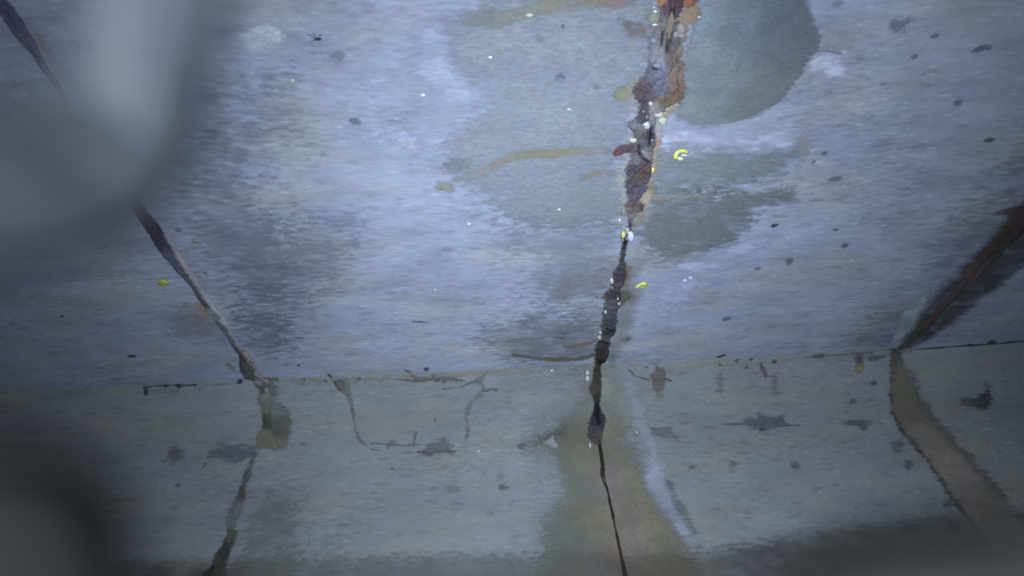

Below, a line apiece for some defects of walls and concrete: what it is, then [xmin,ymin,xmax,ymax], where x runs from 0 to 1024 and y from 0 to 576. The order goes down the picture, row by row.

crack [0,0,63,83]
crack [143,219,533,576]
water stain [401,0,660,238]
water stain [635,0,849,305]
crack [586,0,1024,576]